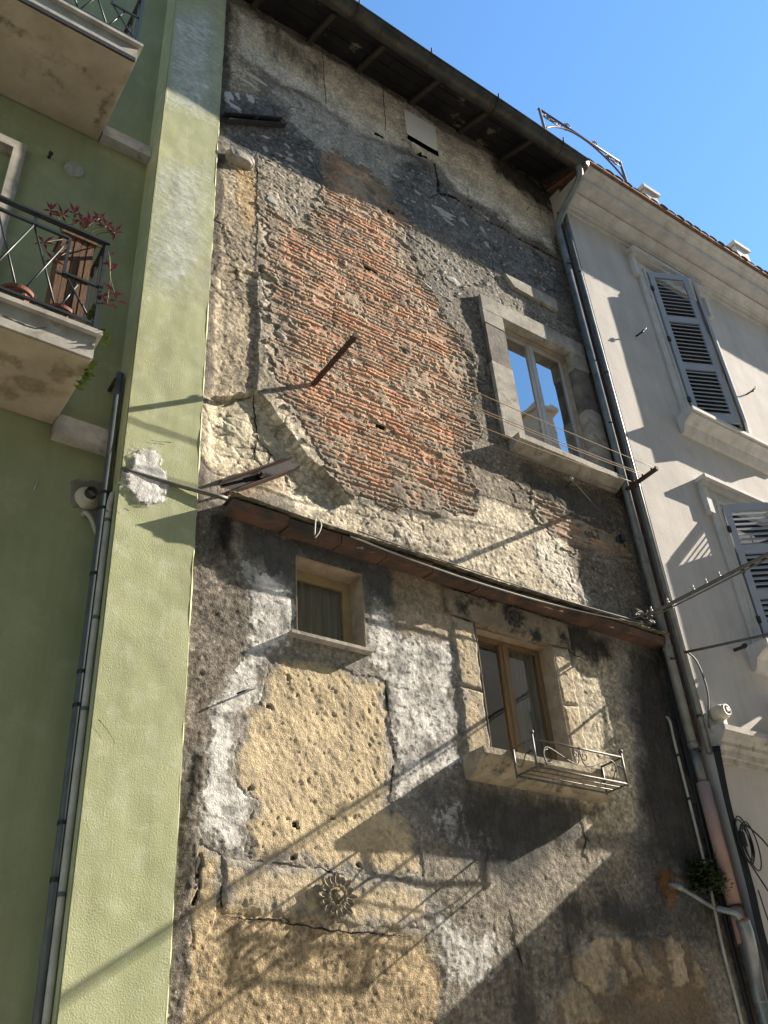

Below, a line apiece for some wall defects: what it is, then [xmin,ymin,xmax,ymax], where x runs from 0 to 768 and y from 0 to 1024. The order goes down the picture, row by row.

crack [382,88,553,258]
spalling [254,121,523,563]
crack [252,396,273,463]
spalling [184,551,497,951]
crack [192,855,407,938]